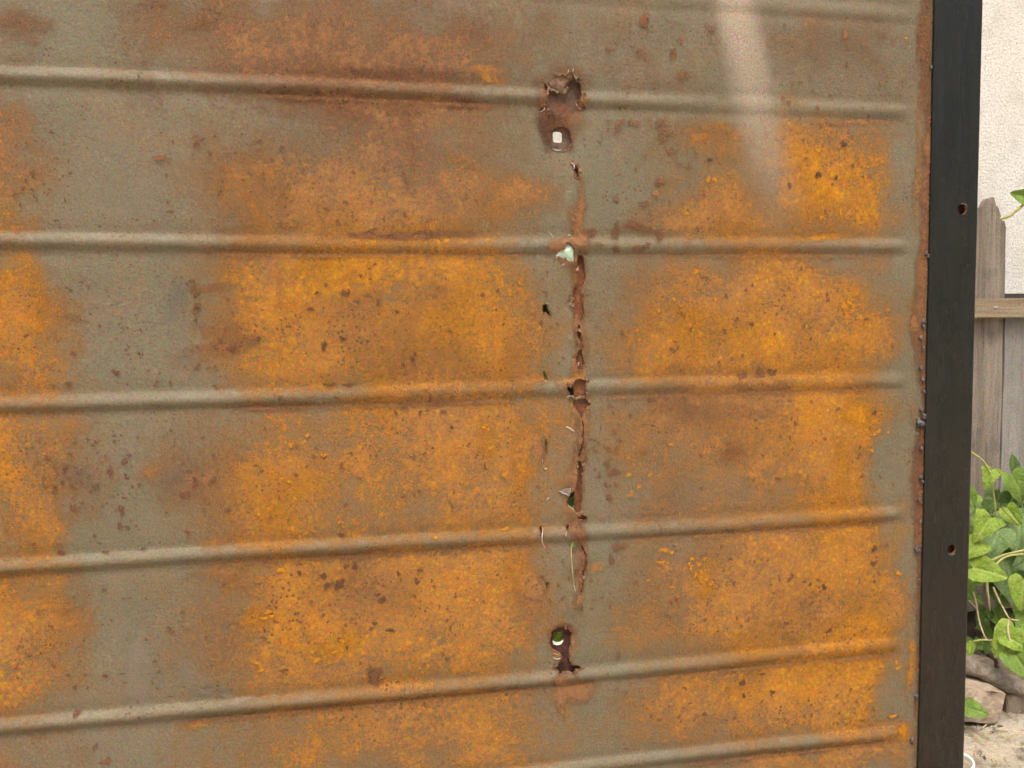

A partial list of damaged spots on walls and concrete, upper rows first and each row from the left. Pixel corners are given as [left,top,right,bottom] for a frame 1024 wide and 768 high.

rust [0,254,81,719]
rust [133,0,595,768]
crack [558,253,591,594]
crack [570,160,582,180]
rust [608,0,932,768]